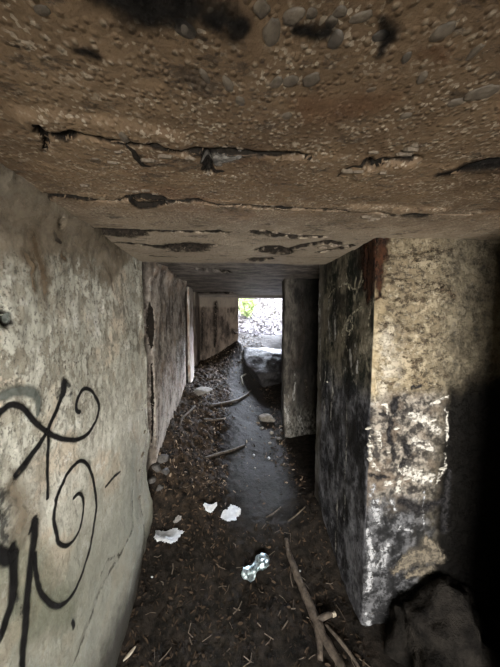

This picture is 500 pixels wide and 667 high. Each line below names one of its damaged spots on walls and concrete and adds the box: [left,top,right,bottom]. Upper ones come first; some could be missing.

crack [31,124,312,172]
spalling [102,228,230,258]
spalling [247,229,356,262]
corrosion [360,238,390,305]